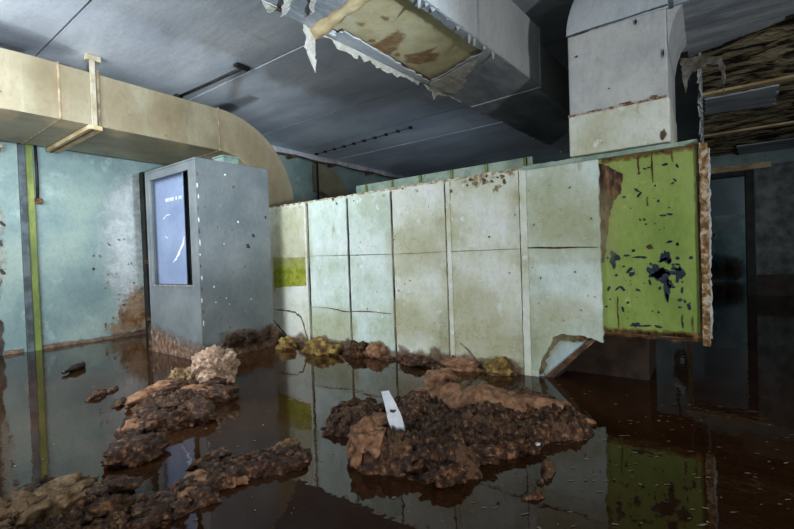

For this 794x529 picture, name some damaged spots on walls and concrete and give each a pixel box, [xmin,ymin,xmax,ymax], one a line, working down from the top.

rust [599,143,694,263]
rust [112,290,146,335]
peeling [605,240,693,328]
rust [604,299,701,342]